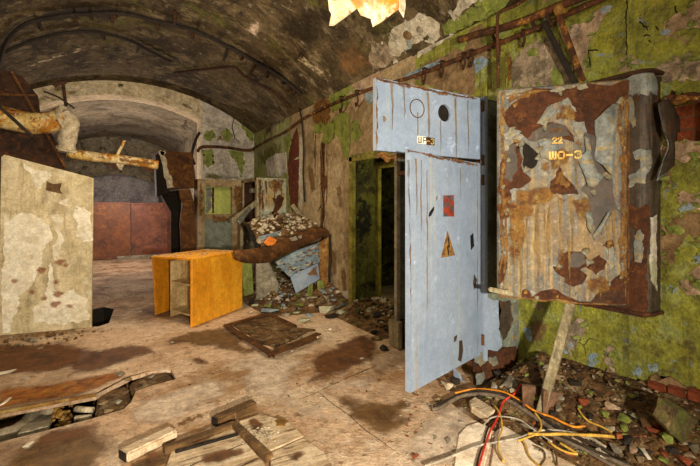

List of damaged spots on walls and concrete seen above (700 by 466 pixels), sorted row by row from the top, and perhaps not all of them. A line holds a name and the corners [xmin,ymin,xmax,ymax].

peeling [349,0,494,112]
peeling [46,181,63,194]
peeling [660,170,700,296]
leakage [0,344,154,375]
leakage [309,336,376,381]
leakage [337,378,409,433]
flaking render [630,363,700,403]